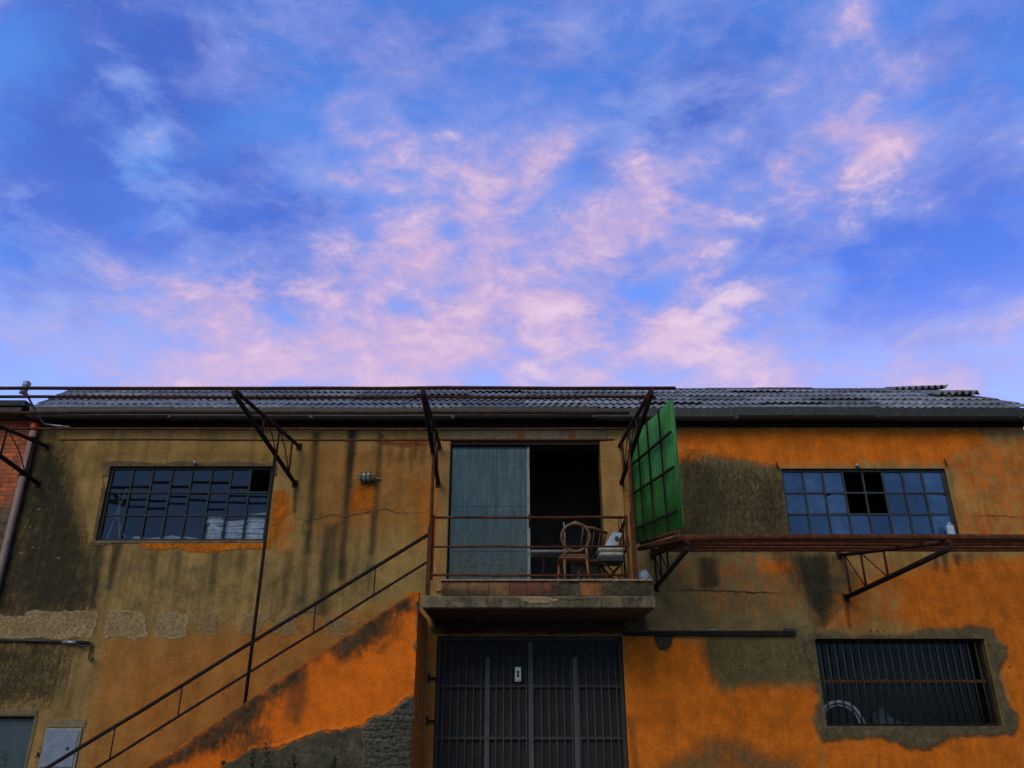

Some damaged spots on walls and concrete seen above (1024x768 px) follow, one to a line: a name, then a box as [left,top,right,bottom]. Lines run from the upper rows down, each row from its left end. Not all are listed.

leakage [1,441,121,612]
peeling [140,491,288,552]
leakage [340,427,354,571]
leakage [680,455,789,535]
peeling [0,609,188,640]
peeling [239,610,298,636]
leakage [792,553,832,622]
peeling [220,682,416,768]